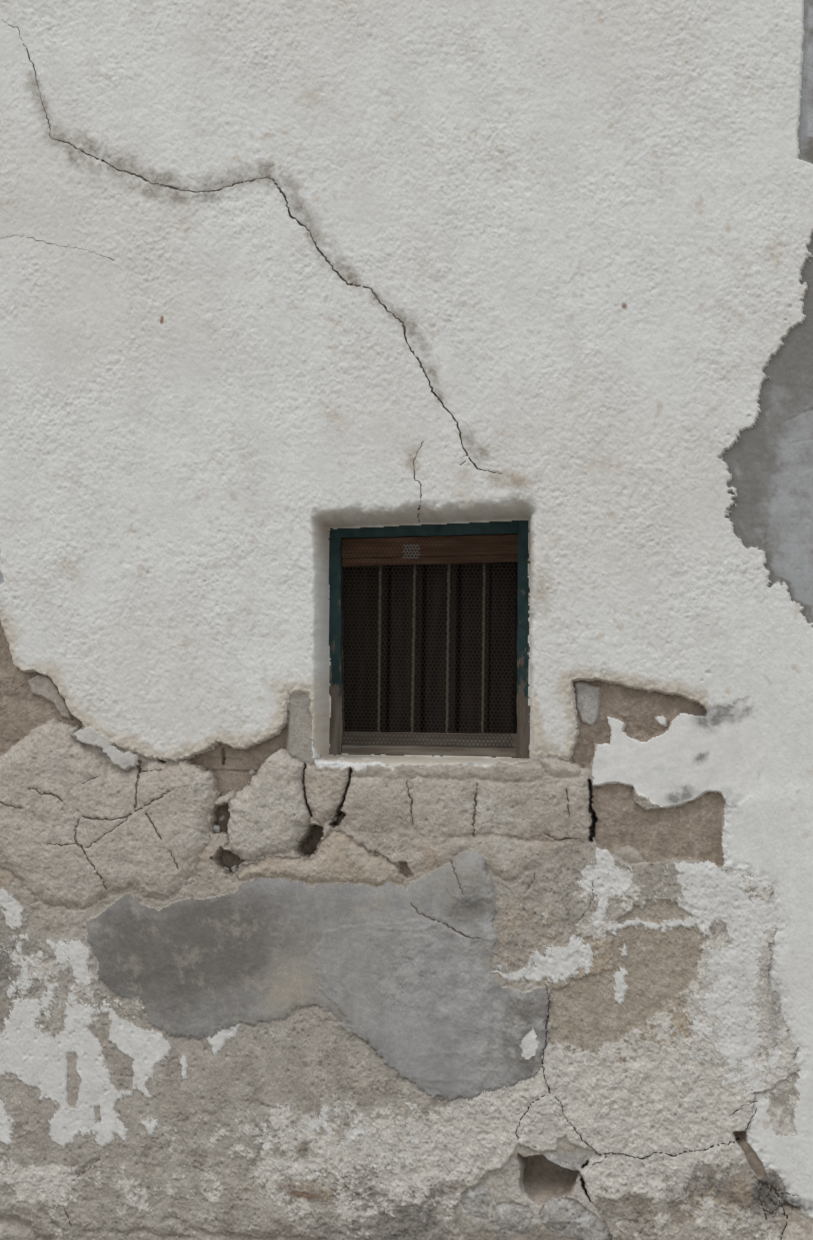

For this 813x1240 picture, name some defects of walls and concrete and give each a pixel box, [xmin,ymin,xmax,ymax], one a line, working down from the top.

crack [1,19,502,474]
spalling [0,620,83,756]
crack [0,760,179,890]
crack [302,764,352,825]
crack [471,783,479,836]
crack [544,780,597,841]
spalling [0,680,800,1149]
peeling [240,1102,419,1178]
spalling [456,1135,613,1240]
crack [516,986,757,1202]
spalling [734,1131,767,1178]
crack [756,1178,798,1240]